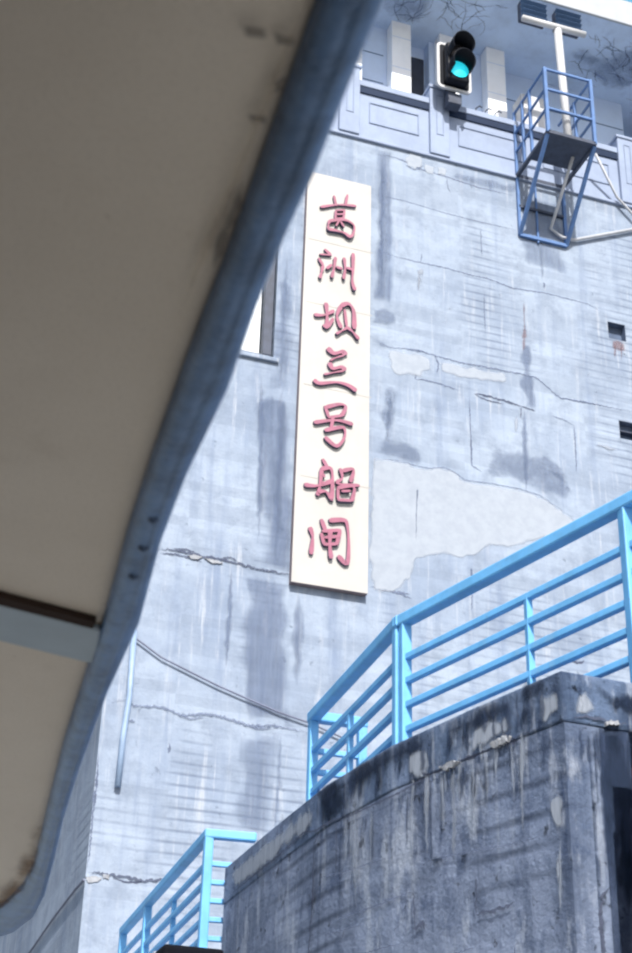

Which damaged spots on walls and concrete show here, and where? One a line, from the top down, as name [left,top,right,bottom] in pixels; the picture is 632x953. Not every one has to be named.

crack [387,346,613,471]
crack [161,548,288,574]
crack [129,704,297,731]
leakage [578,694,592,712]
leakage [609,694,632,712]
leakage [233,680,557,892]
crack [86,761,162,884]
leakage [551,797,562,826]
leakage [579,732,632,953]